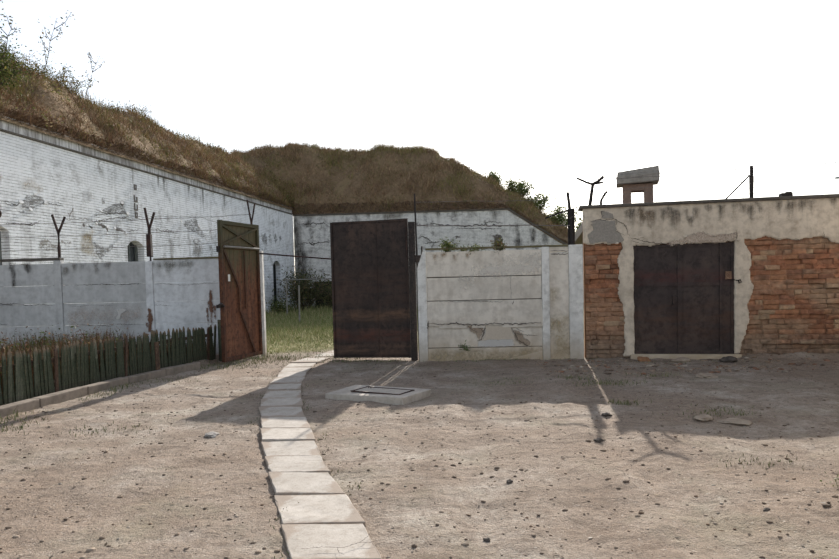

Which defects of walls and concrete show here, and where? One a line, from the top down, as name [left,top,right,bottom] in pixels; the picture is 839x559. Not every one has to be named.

peeling [19,193,47,211]
peeling [100,198,130,215]
crack [420,221,516,244]
flaking render [585,211,630,359]
flaking render [670,232,839,356]
rust [206,290,216,325]
spalling [468,325,530,347]